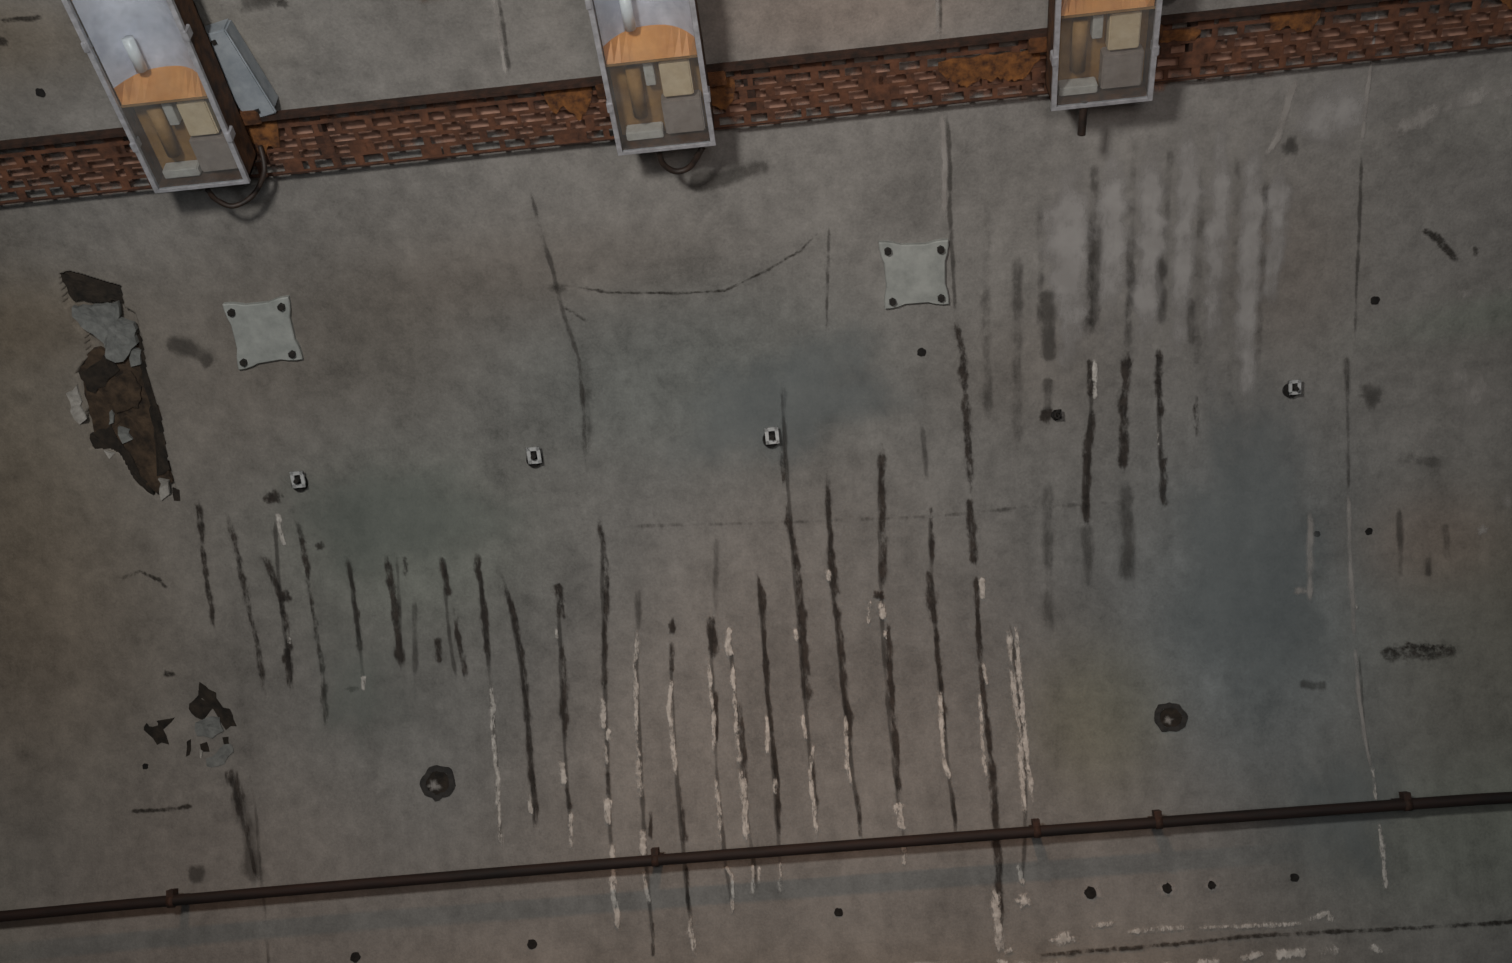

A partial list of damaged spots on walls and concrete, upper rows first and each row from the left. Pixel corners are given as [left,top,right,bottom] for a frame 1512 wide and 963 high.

rust [0,140,144,190]
rust [255,89,612,166]
rust [712,59,1046,121]
rust [1154,3,1512,91]
spalling [60,271,180,501]
spalling [144,682,237,768]
damp [707,618,750,840]
damp [757,578,781,829]
damp [785,514,818,835]
damp [826,487,861,833]
damp [867,455,906,829]
damp [966,500,1034,963]